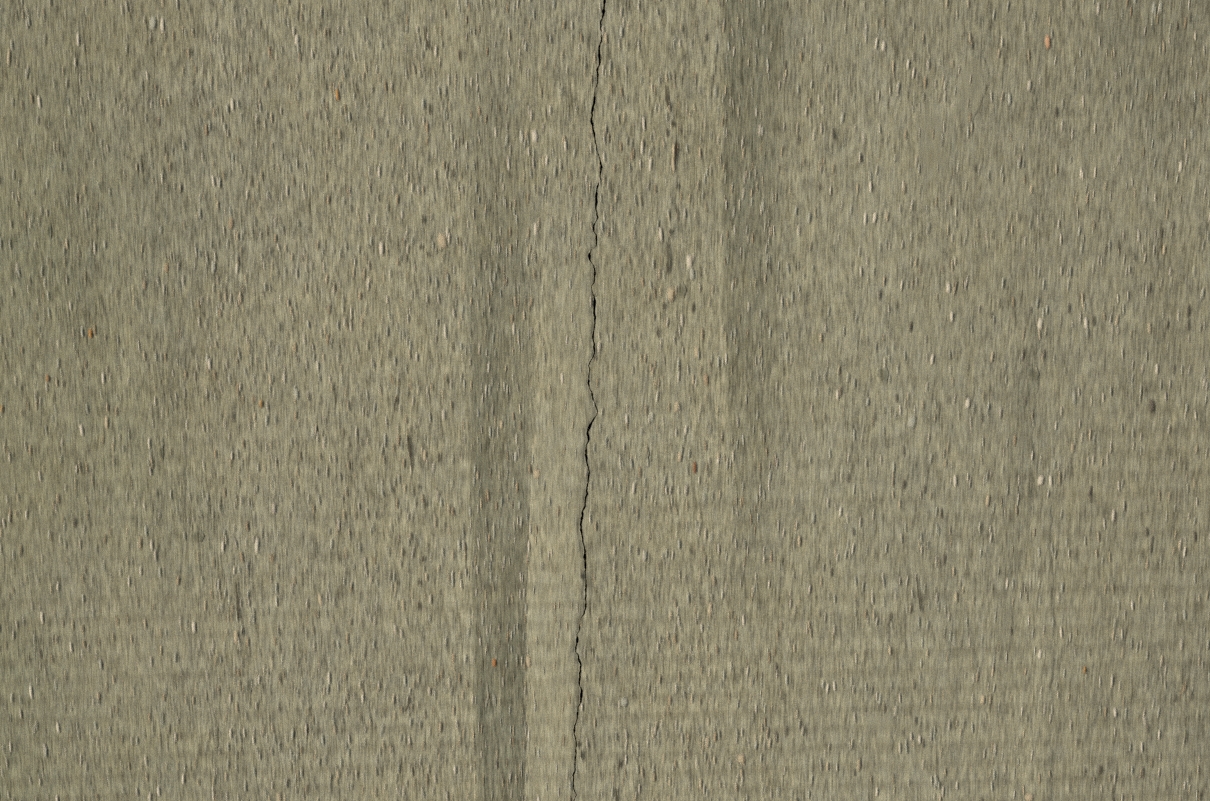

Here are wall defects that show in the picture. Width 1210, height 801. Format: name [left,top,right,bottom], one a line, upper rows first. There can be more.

crack [572,0,606,801]